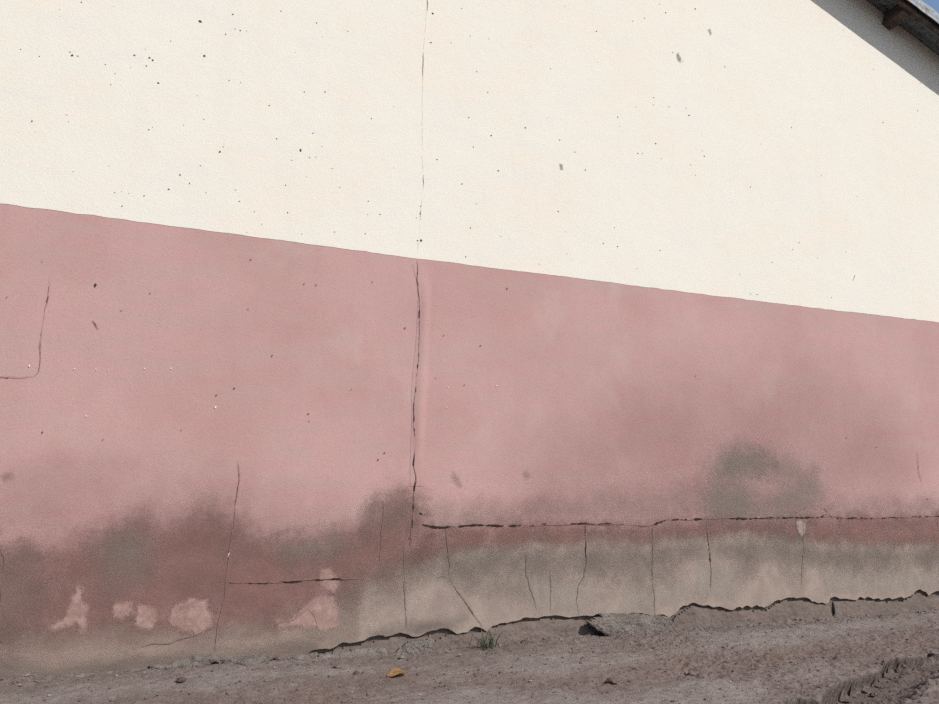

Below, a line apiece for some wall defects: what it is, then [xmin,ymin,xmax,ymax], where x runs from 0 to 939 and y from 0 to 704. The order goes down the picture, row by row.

crack [0,281,50,378]
crack [404,0,939,629]
crack [141,464,363,648]
damp [0,488,939,638]